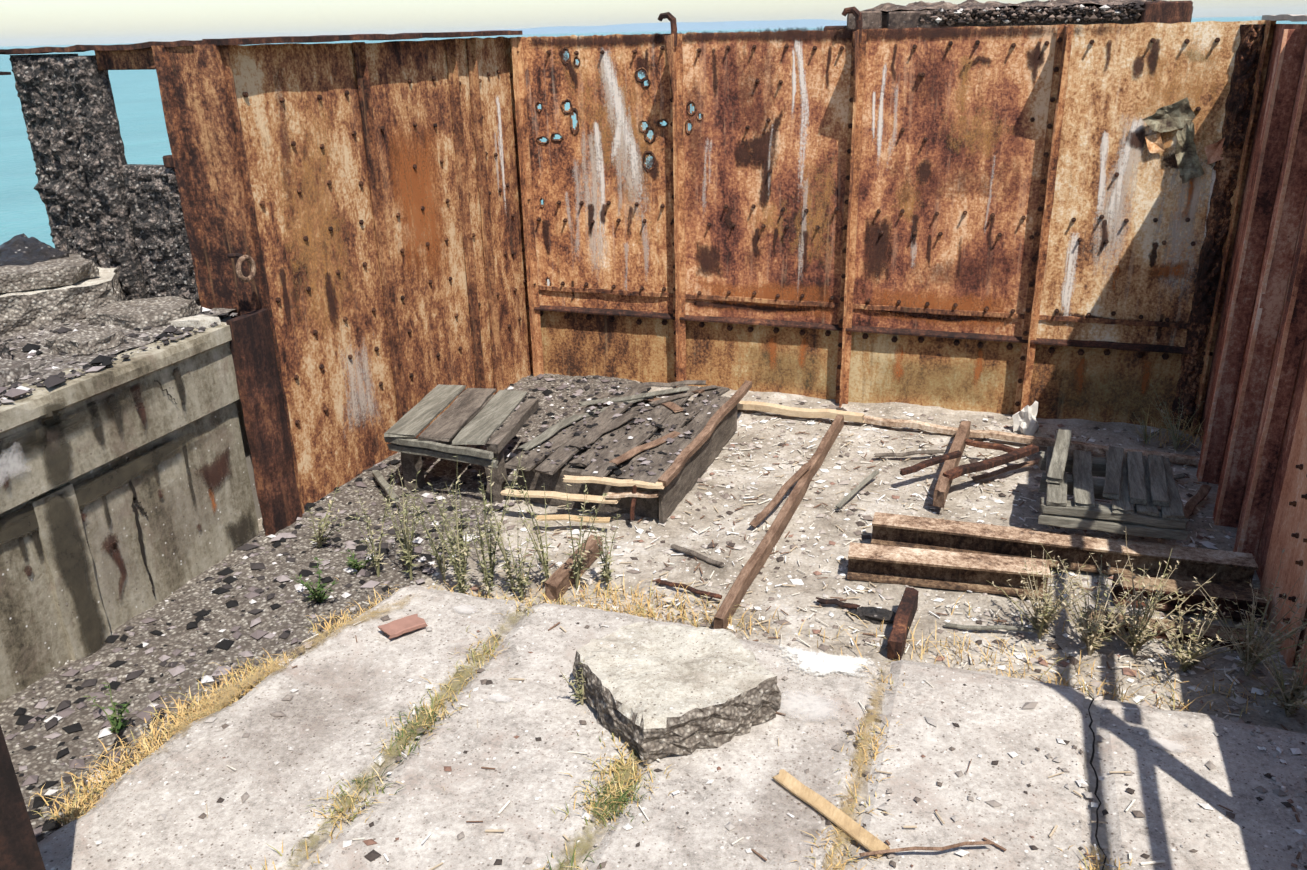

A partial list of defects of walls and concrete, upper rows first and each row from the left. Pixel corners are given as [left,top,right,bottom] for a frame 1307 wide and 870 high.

leakage [580,52,642,268]
corrosion [692,244,833,317]
corrosion [530,25,1055,272]
leakage [792,39,809,181]
corrosion [862,160,1003,327]
corrosion [1099,220,1108,251]
peeling [1145,121,1225,184]
corrosion [1126,24,1266,430]
leakage [173,368,185,408]
leakage [0,384,196,655]
corrosion [196,447,230,511]
crack [1087,693,1107,870]